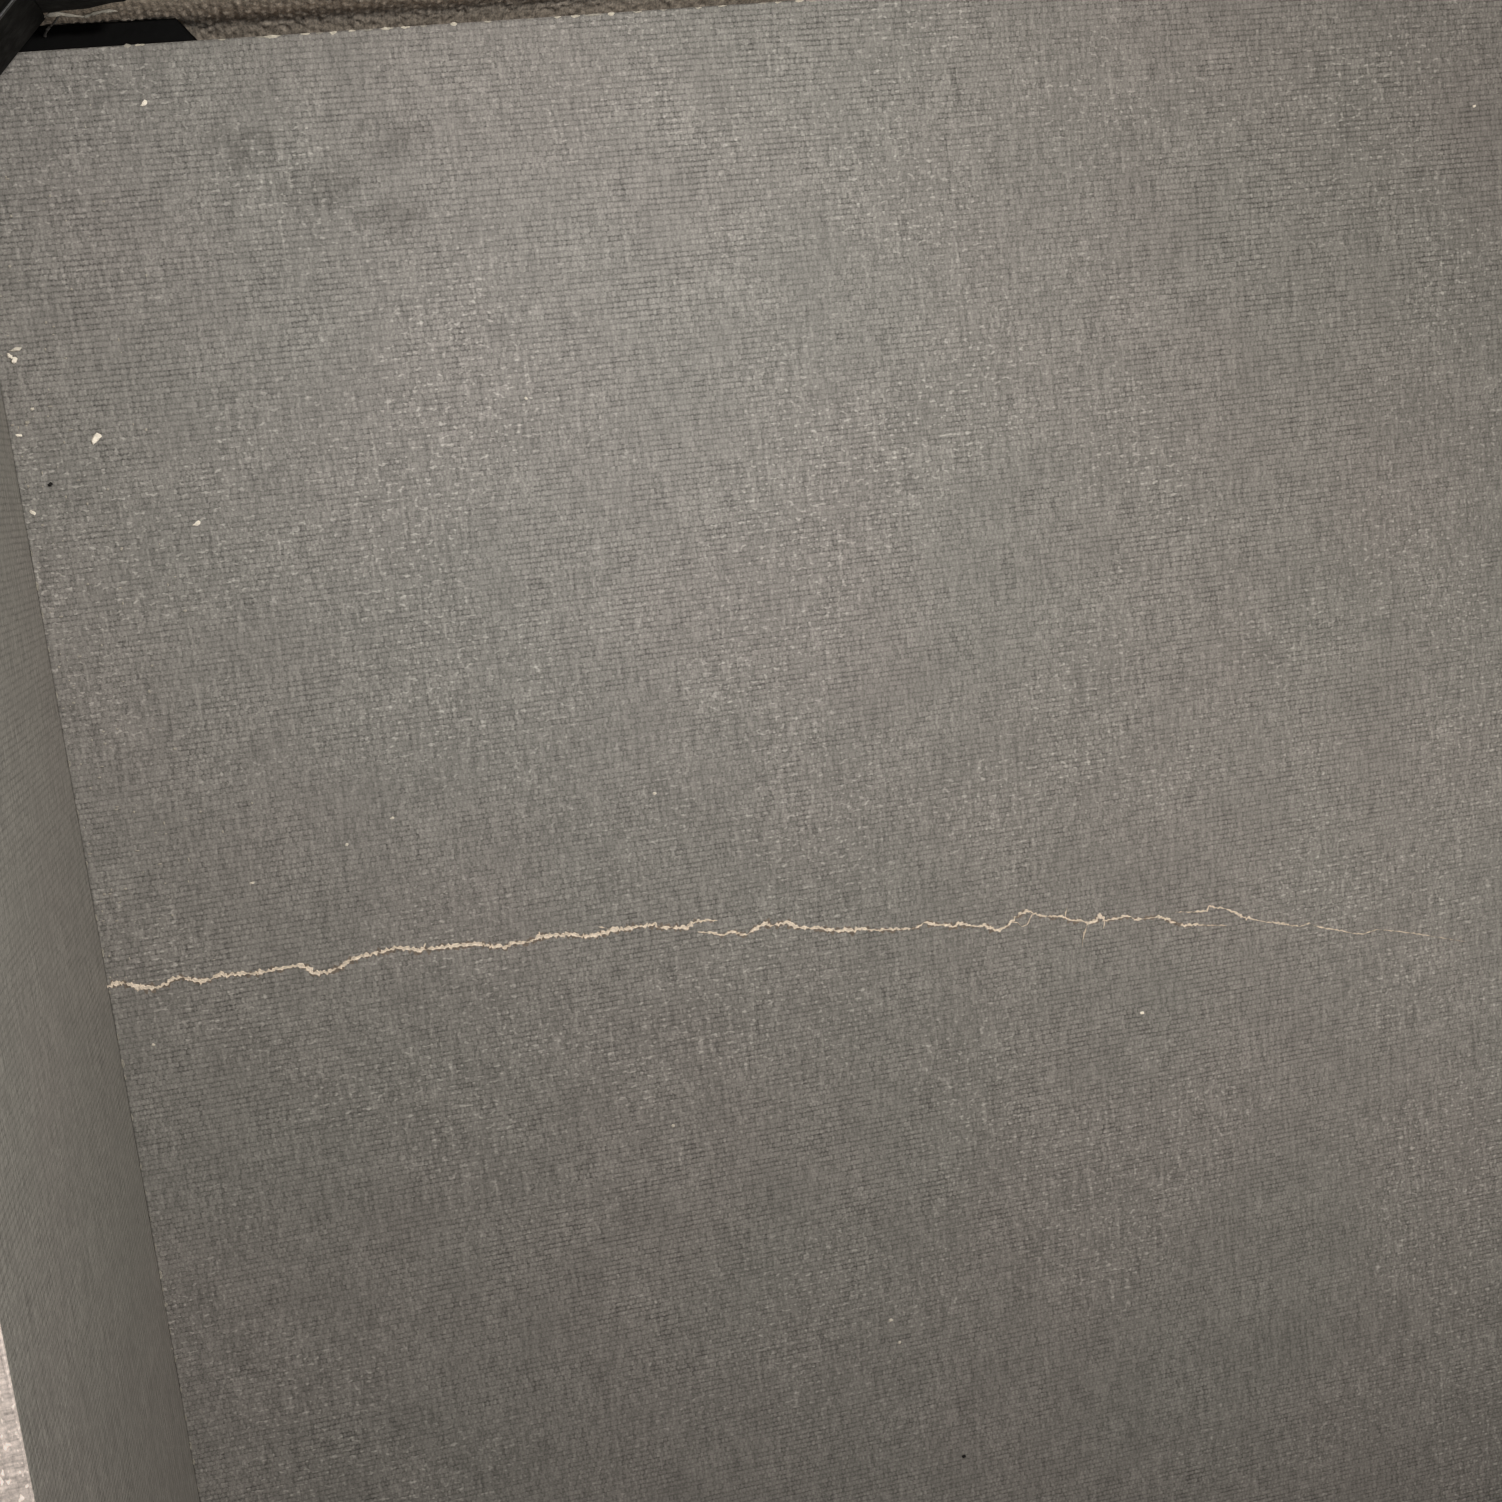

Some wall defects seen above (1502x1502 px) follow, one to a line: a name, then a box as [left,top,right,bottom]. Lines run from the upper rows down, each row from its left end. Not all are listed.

crack [107,905,1459,994]